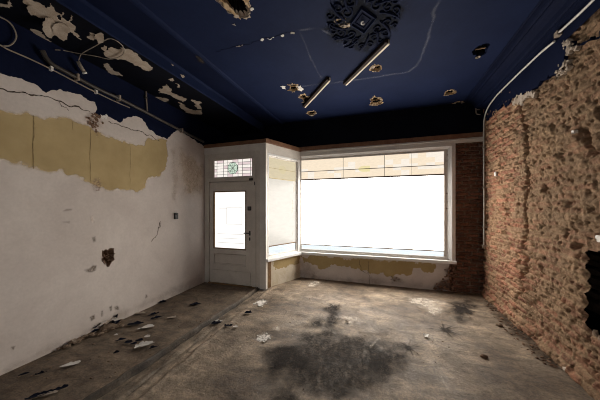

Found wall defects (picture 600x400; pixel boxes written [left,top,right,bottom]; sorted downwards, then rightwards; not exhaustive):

peeling [23,0,153,76]
flaking render [555,37,582,80]
crack [0,88,90,126]
flaking render [86,113,108,133]
peeling [156,74,202,114]
flaking render [511,90,539,106]
spalling [102,248,115,267]
peeling [273,255,436,282]
spalling [585,250,600,315]
water stain [262,304,420,400]